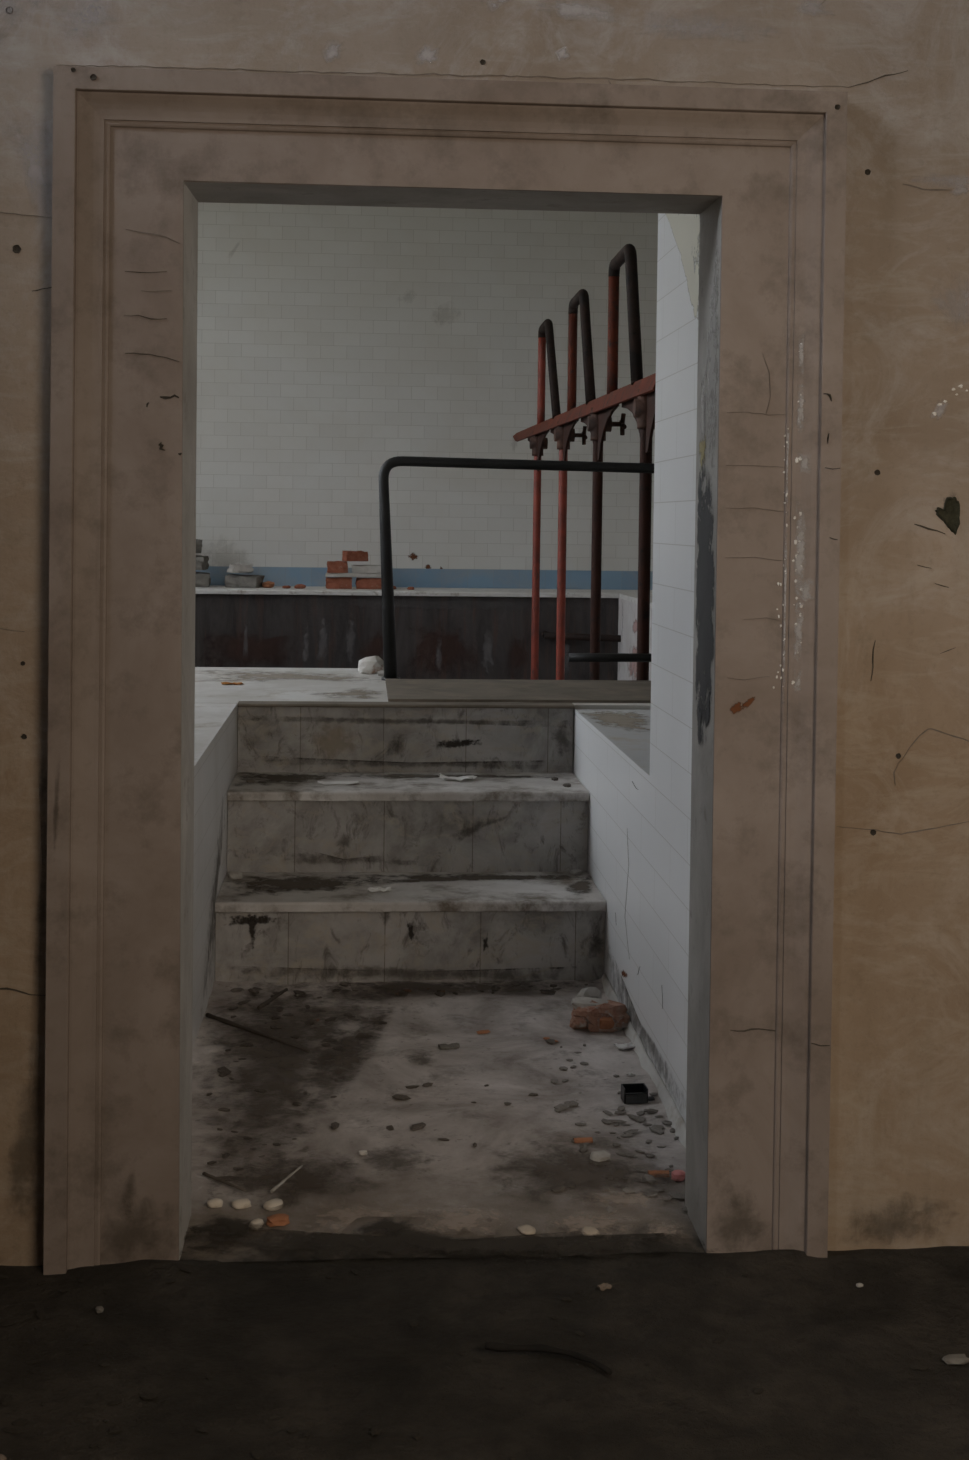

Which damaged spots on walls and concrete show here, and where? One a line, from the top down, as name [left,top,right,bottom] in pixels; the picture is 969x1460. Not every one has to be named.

spalling [935,497,960,535]
corrosion [730,697,755,714]